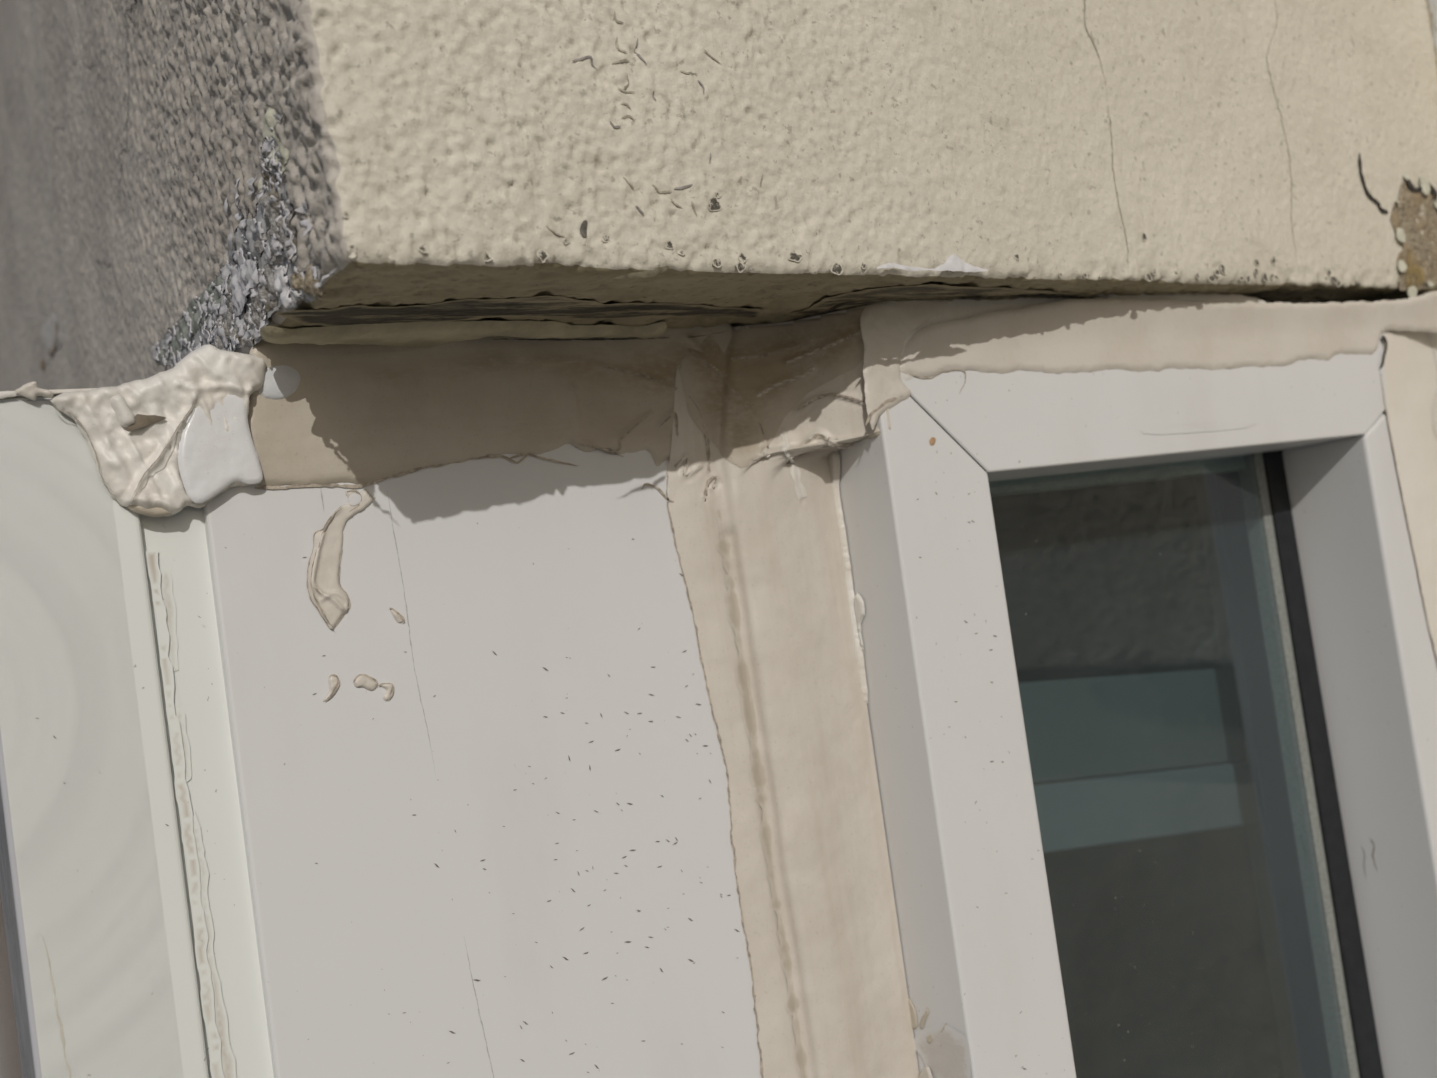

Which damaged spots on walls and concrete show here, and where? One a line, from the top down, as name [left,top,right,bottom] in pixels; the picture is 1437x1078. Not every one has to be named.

leakage [707,191,722,211]
peeling [152,106,337,367]
spalling [1391,173,1437,298]
leakage [664,240,686,255]
leakage [712,252,748,273]
leakage [788,252,803,262]
leakage [831,262,843,275]
leakage [1196,256,1279,283]
leakage [276,271,1112,468]